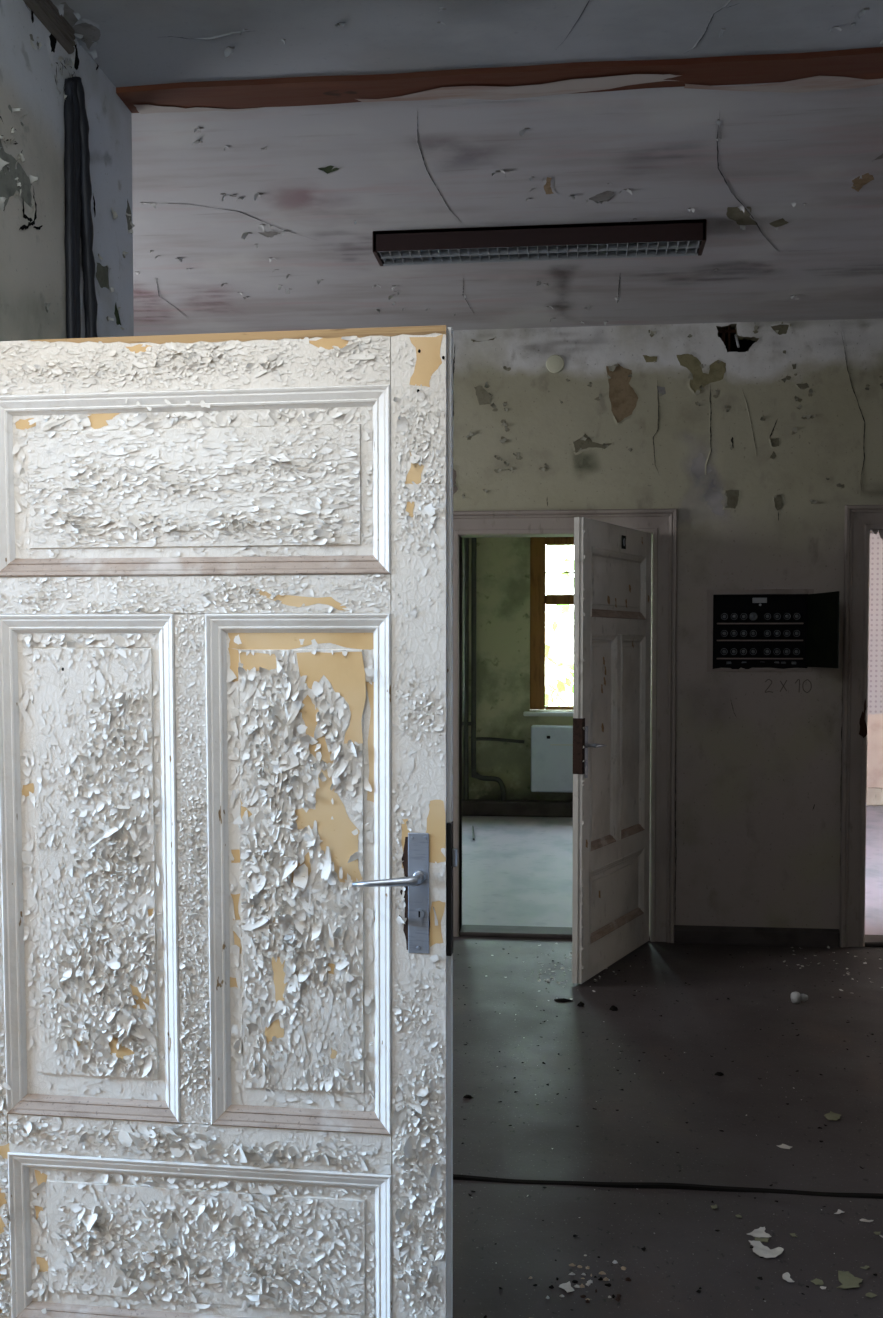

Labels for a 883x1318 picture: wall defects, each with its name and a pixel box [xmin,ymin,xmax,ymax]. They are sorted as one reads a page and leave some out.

peeling [0,132,38,214]
crack [0,116,43,230]
peeling [111,196,146,236]
peeling [241,224,291,290]
peeling [317,166,342,175]
crack [415,110,460,223]
peeling [526,176,632,204]
peeling [725,202,796,230]
crack [717,117,845,252]
peeling [571,354,659,455]
peeling [675,321,816,419]
crack [842,332,867,497]